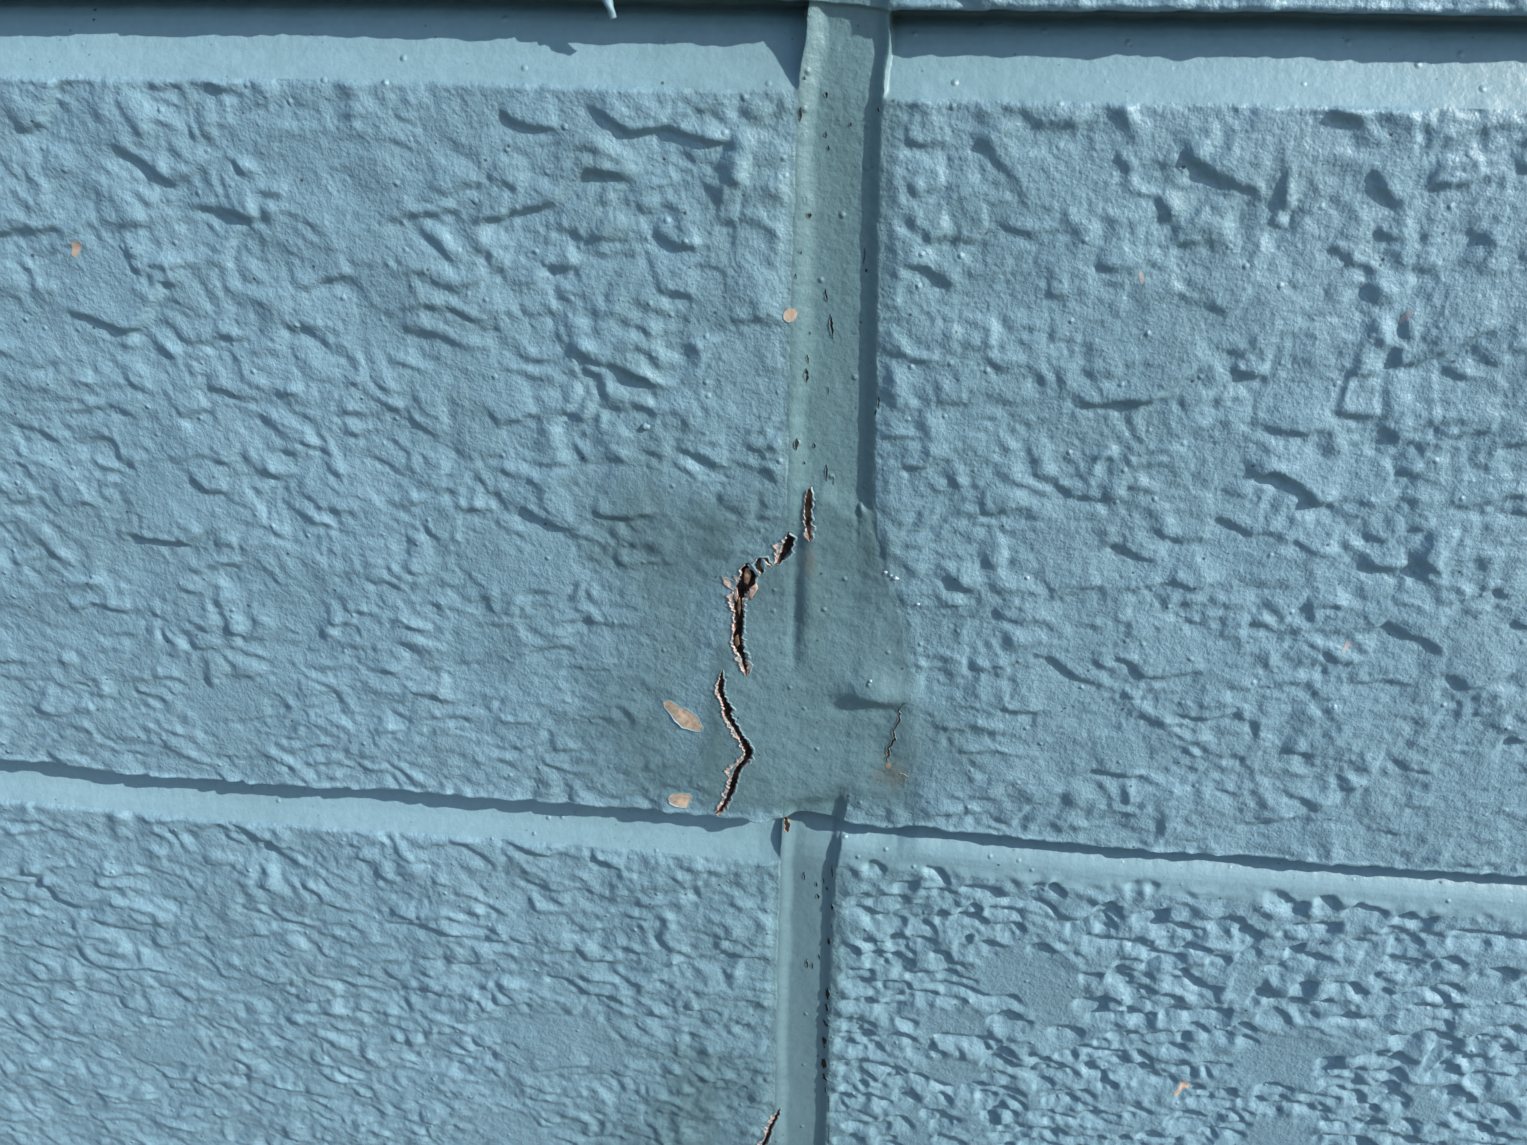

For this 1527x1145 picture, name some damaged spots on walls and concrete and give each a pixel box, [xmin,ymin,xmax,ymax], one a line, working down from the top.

crack [798,76,880,151]
crack [795,196,834,395]
crack [713,438,835,816]
crack [756,1108,782,1145]